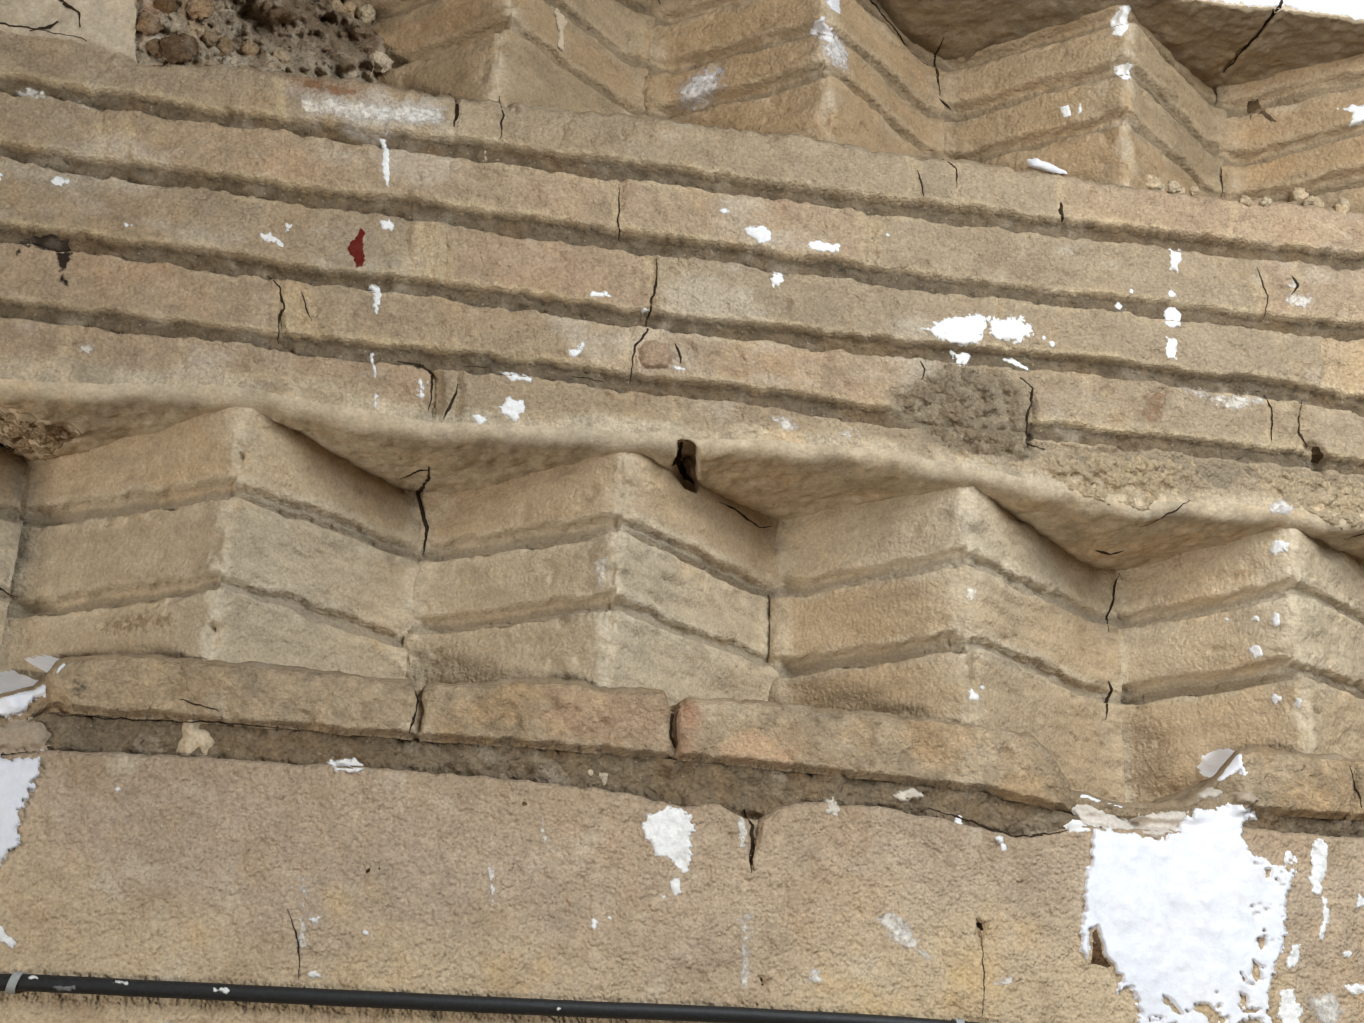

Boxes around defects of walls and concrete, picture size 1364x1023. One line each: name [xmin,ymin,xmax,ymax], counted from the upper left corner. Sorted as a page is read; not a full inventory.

crack [0,0,87,41]
spalling [134,0,394,83]
crack [1224,0,1283,72]
peeling [1211,0,1364,20]
crack [615,189,623,245]
crack [630,259,682,382]
crack [400,466,431,555]
peeling [0,654,65,719]
peeling [0,749,44,867]
crack [744,809,755,873]
peeling [1064,748,1297,1023]
peeling [0,926,17,949]